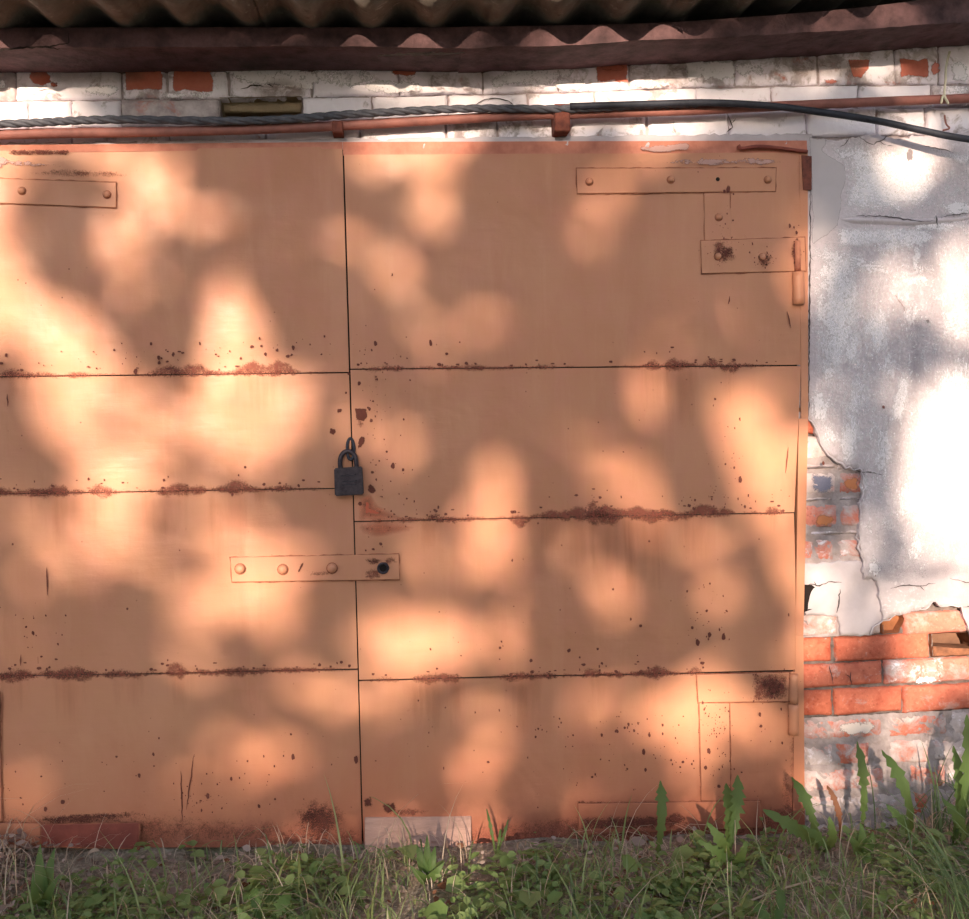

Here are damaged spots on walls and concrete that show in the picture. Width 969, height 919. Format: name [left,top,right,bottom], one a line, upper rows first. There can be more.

crack [858,213,966,225]
corrosion [136,354,297,376]
corrosion [357,360,566,371]
corrosion [609,347,777,372]
peeling [805,142,969,578]
corrosion [0,477,137,498]
corrosion [151,466,320,495]
corrosion [358,471,735,531]
corrosion [0,656,351,682]
corrosion [496,661,705,682]
flaking render [803,585,969,831]
corrosion [43,801,348,842]